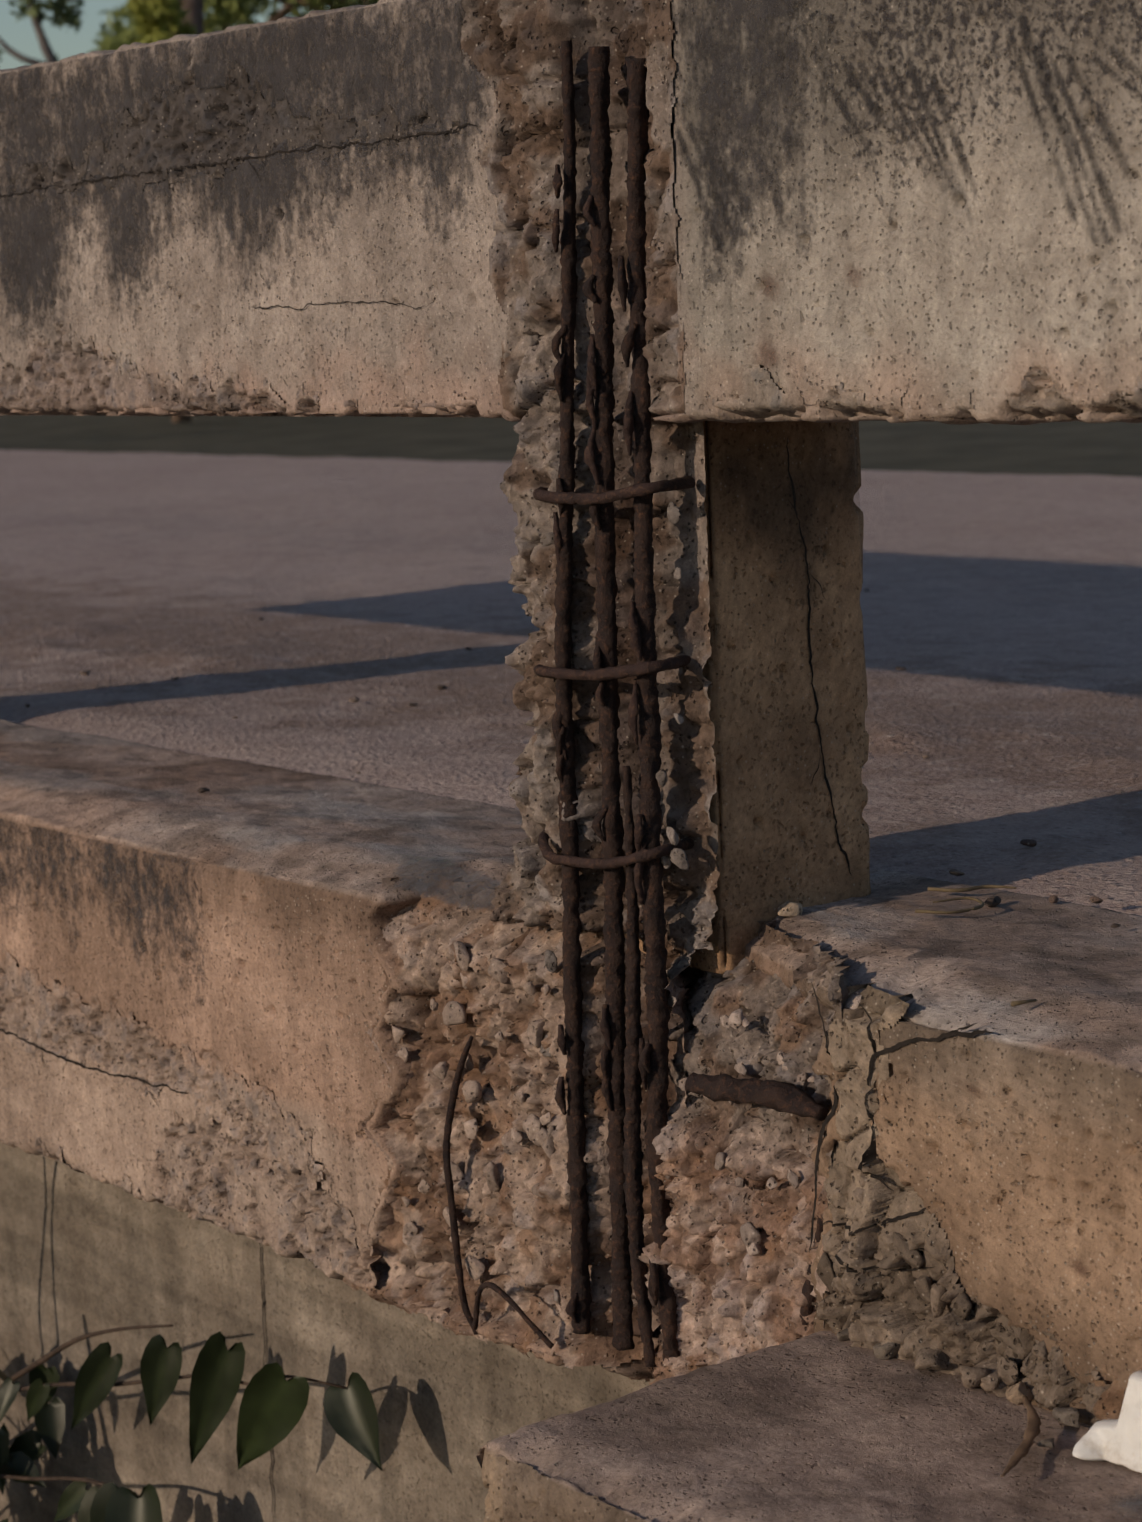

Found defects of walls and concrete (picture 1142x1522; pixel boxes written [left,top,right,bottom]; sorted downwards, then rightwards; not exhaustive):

spalling [6,60,460,209]
crack [0,107,477,197]
spalling [0,323,482,417]
water stain [0,0,485,339]
crack [254,295,436,313]
water stain [670,0,1142,281]
spalling [460,0,1142,1426]
crack [786,437,852,876]
water stain [0,819,201,958]
crack [0,1029,190,1107]
spalling [0,879,658,1382]
crack [809,982,993,1273]